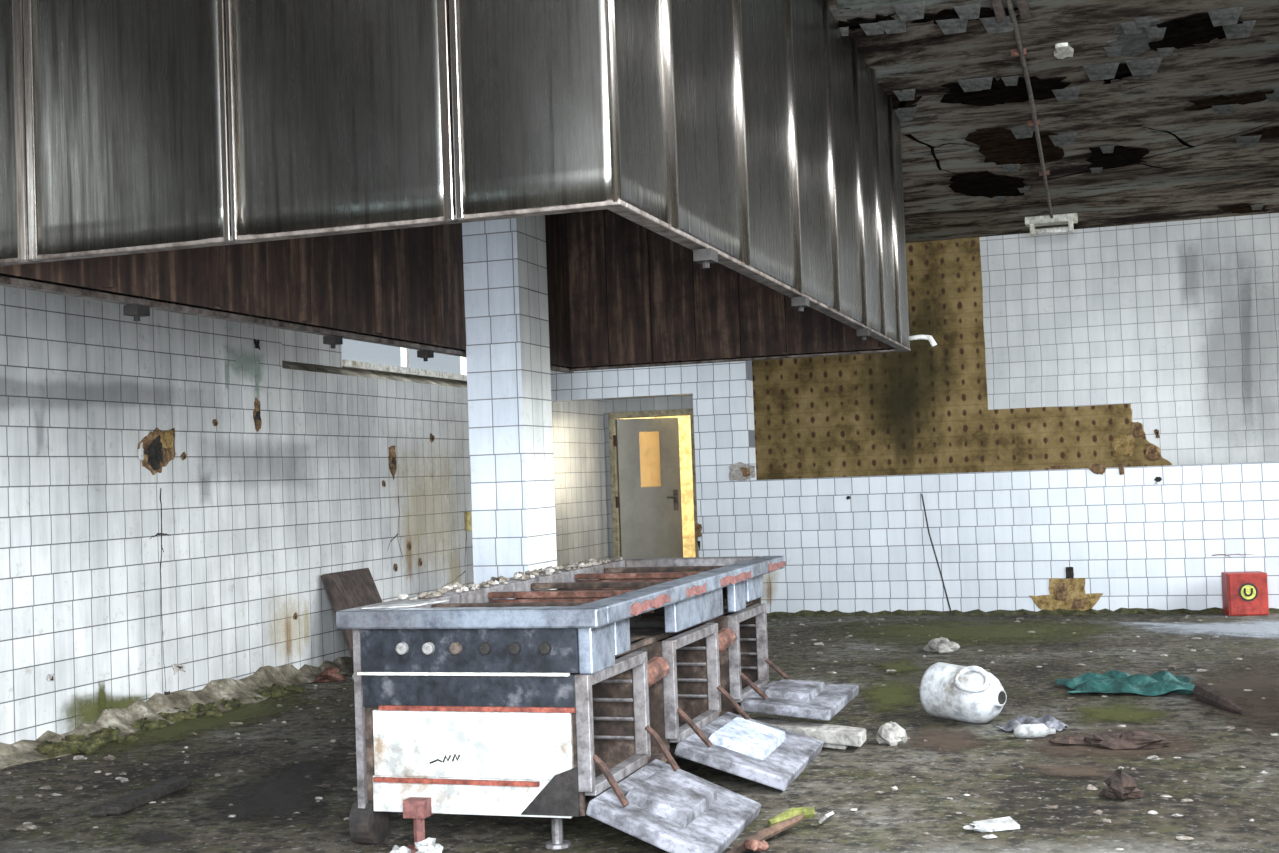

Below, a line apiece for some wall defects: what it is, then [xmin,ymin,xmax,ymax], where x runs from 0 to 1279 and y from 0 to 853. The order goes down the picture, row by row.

spalling [940,7,1256,106]
spalling [886,89,923,122]
spalling [1182,90,1279,115]
spalling [1235,128,1279,147]
spalling [949,127,1077,201]
spalling [1086,145,1150,173]
damp [225,355,259,395]
peeling [729,237,1172,484]
spalling [138,427,186,475]